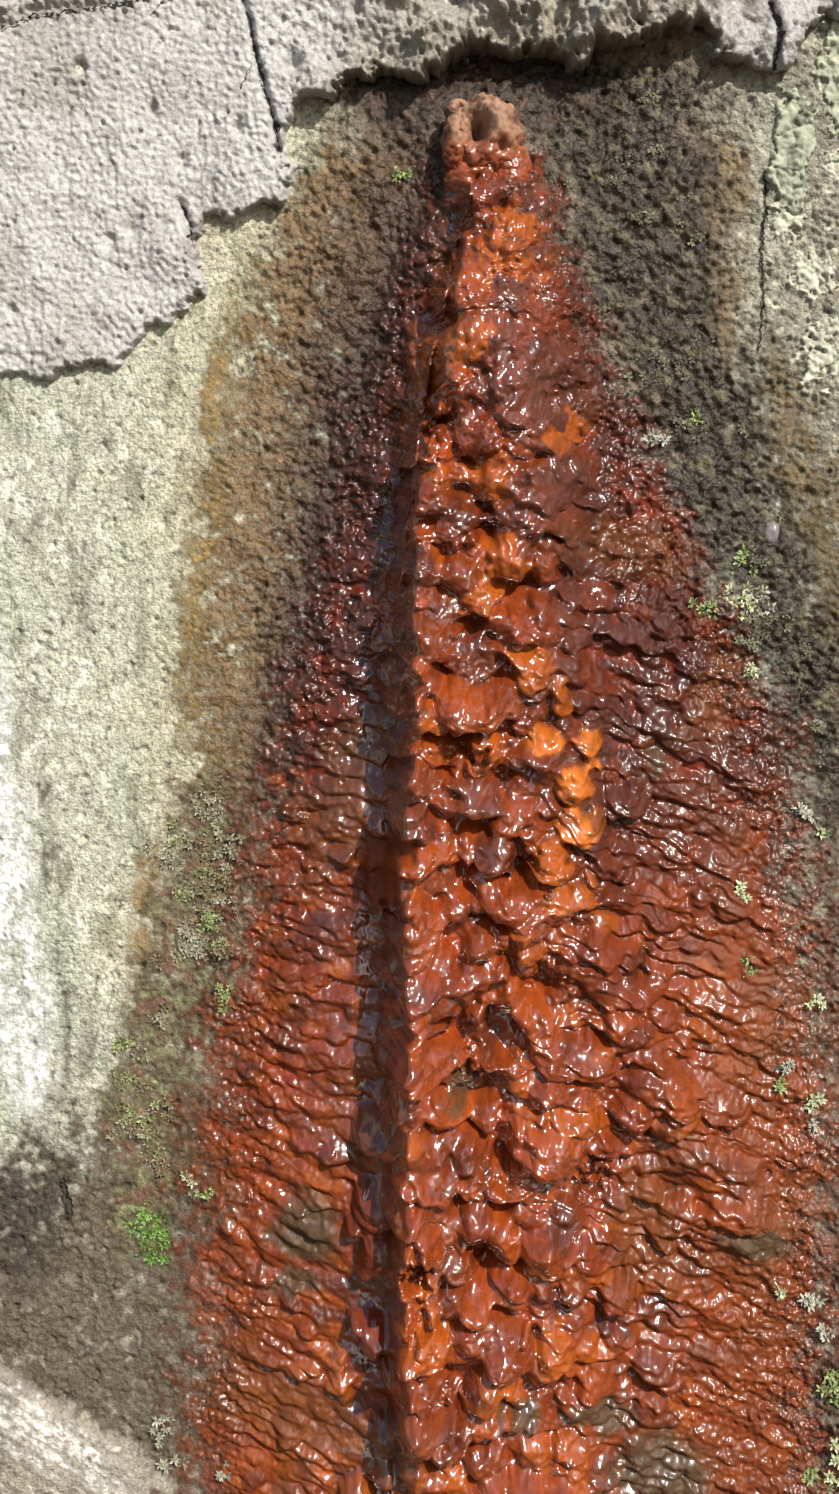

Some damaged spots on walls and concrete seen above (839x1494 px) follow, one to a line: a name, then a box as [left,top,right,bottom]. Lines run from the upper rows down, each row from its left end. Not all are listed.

crack [0,0,169,32]
crack [241,0,280,150]
flaking render [0,0,839,384]
rust [158,92,839,1494]
rust [131,845,164,971]